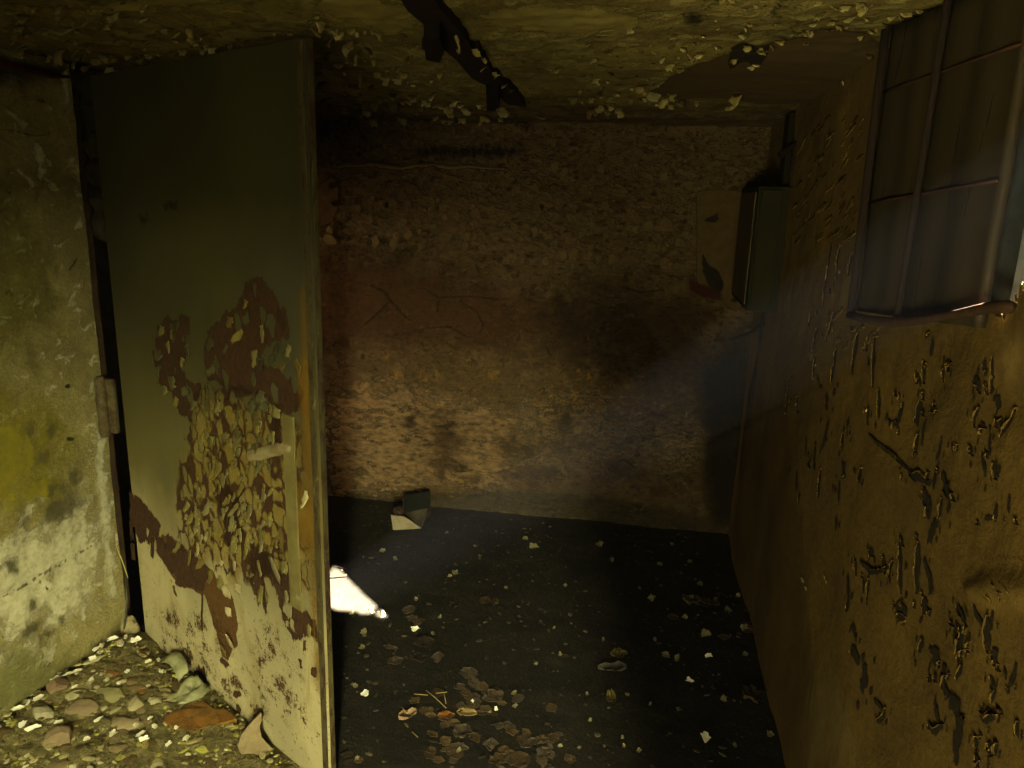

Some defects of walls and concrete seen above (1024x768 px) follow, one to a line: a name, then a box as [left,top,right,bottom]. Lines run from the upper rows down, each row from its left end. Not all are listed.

peeling [454,35,515,93]
peeling [551,0,786,121]
peeling [345,100,546,133]
leakage [45,472,80,522]
corrosion [129,277,320,725]
peeling [176,387,310,590]
leakage [5,558,18,573]
leakage [22,623,49,641]